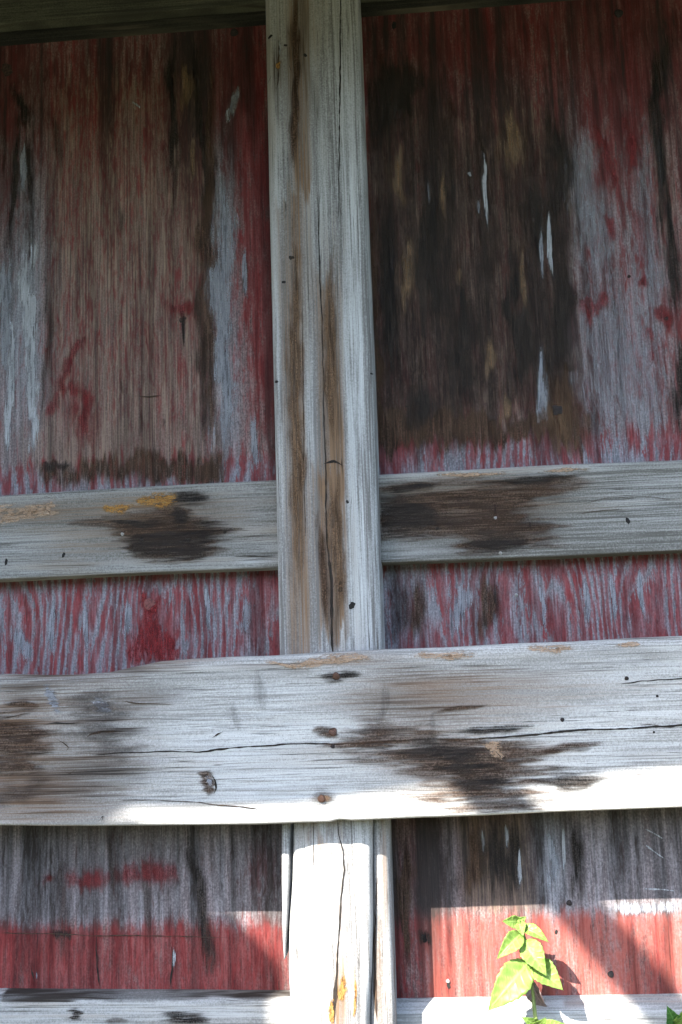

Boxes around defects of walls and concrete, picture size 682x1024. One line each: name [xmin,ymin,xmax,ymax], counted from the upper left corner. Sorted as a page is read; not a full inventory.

peeling [468,161,488,221]
water stain [37,45,239,563]
crack [295,0,343,652]
water stain [367,60,578,462]
peeling [539,216,552,278]
water stain [379,475,583,554]
corrosion [323,671,360,682]
crack [5,713,356,810]
corrosion [313,726,338,737]
water stain [326,719,607,813]
crack [471,724,682,740]
crack [313,823,345,1024]